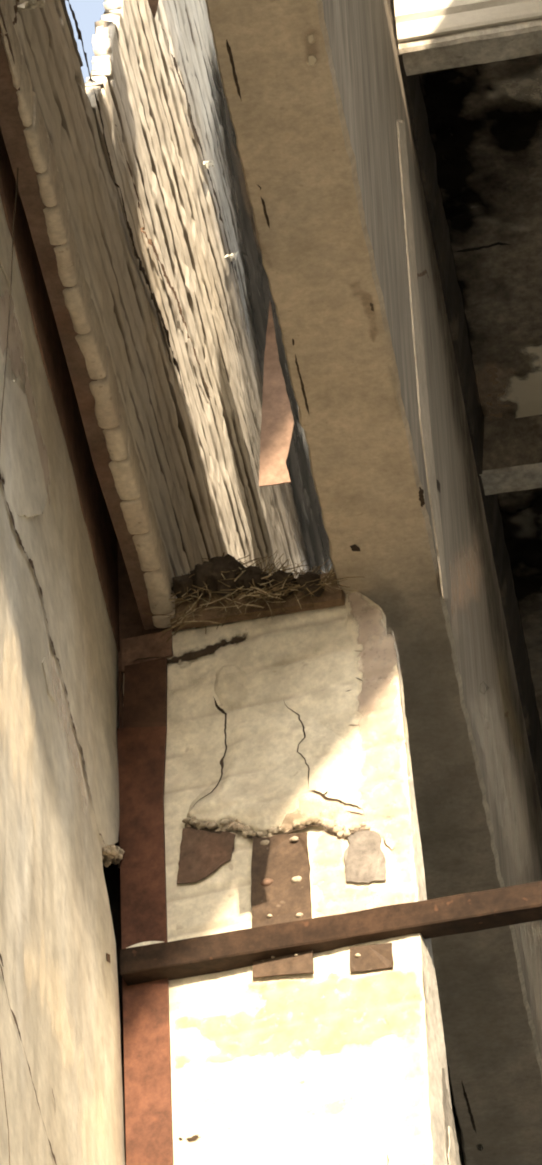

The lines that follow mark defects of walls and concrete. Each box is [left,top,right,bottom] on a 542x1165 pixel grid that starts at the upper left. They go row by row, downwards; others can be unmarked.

crack [0,473,106,846]
peeling [182,591,416,917]
crack [284,703,407,860]
crack [0,954,57,1165]